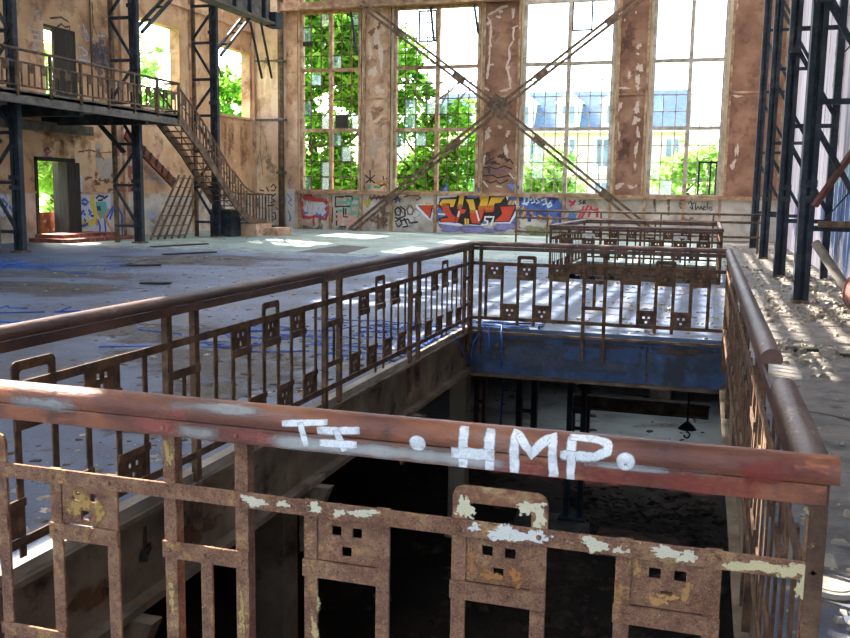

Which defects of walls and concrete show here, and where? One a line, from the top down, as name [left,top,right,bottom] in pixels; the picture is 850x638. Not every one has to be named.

peeling [615,43,643,90]
peeling [632,100,641,168]
peeling [66,489,105,524]
rust [184,514,217,544]
peeling [454,494,554,544]
rust [68,579,109,612]
peeling [719,559,805,600]